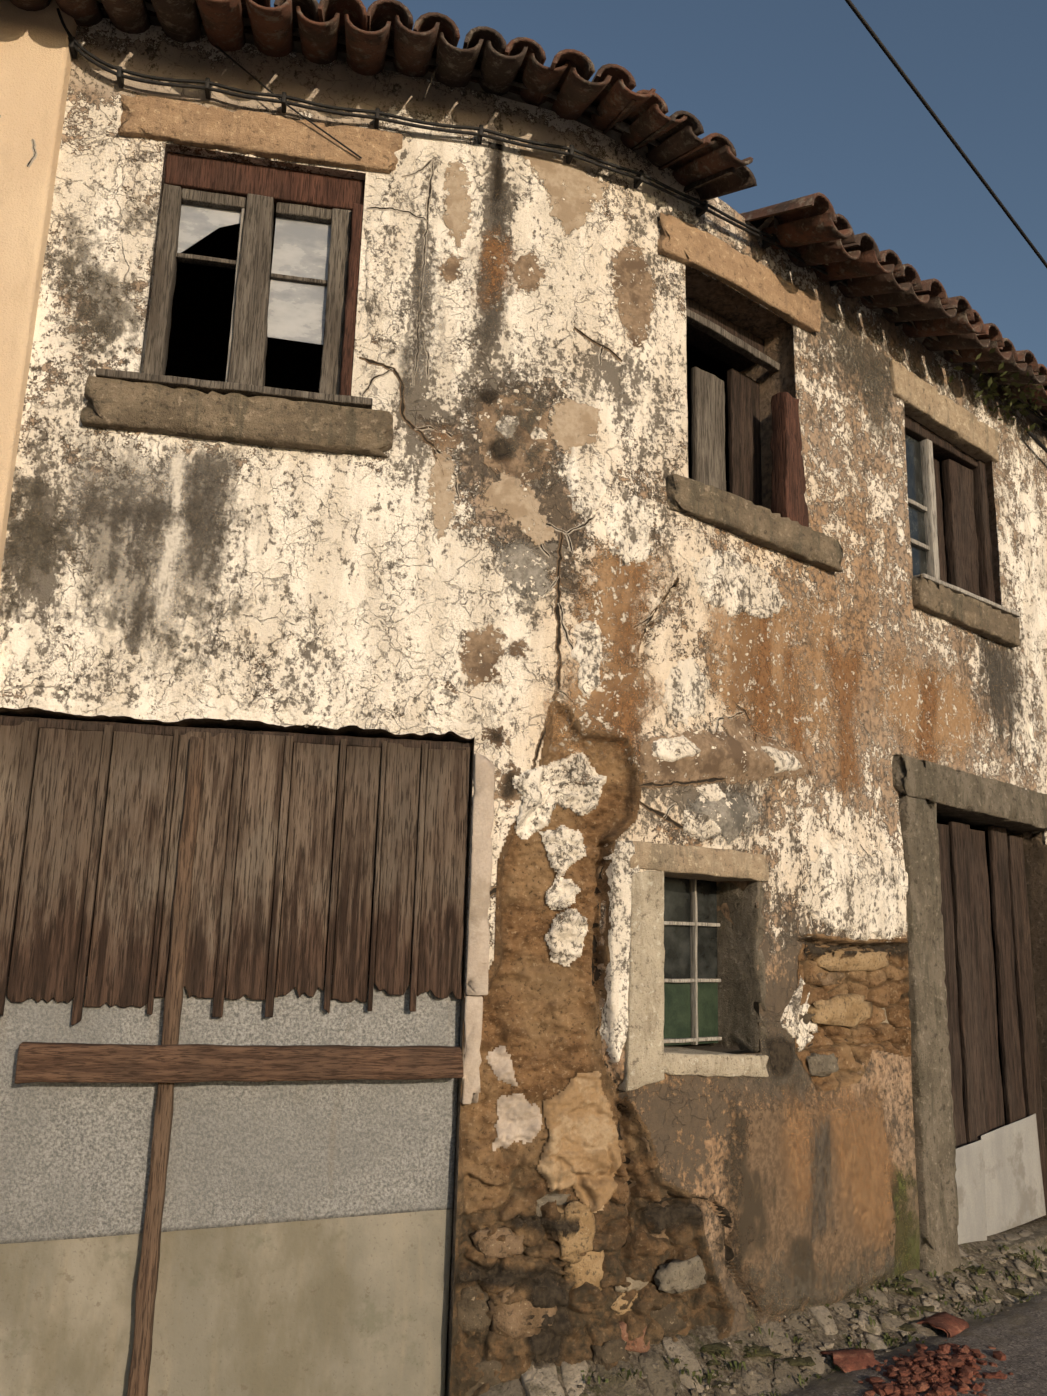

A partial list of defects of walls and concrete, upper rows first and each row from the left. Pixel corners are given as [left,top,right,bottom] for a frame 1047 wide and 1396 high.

leakage [49,218,143,354]
leakage [125,203,156,228]
crack [359,159,460,497]
peeling [439,158,473,283]
peeling [508,251,546,293]
peeling [507,142,610,236]
peeling [609,240,657,348]
leakage [0,451,267,672]
crack [527,489,598,769]
peeling [690,549,788,619]
peeling [599,840,640,1064]
spalling [780,840,912,1092]